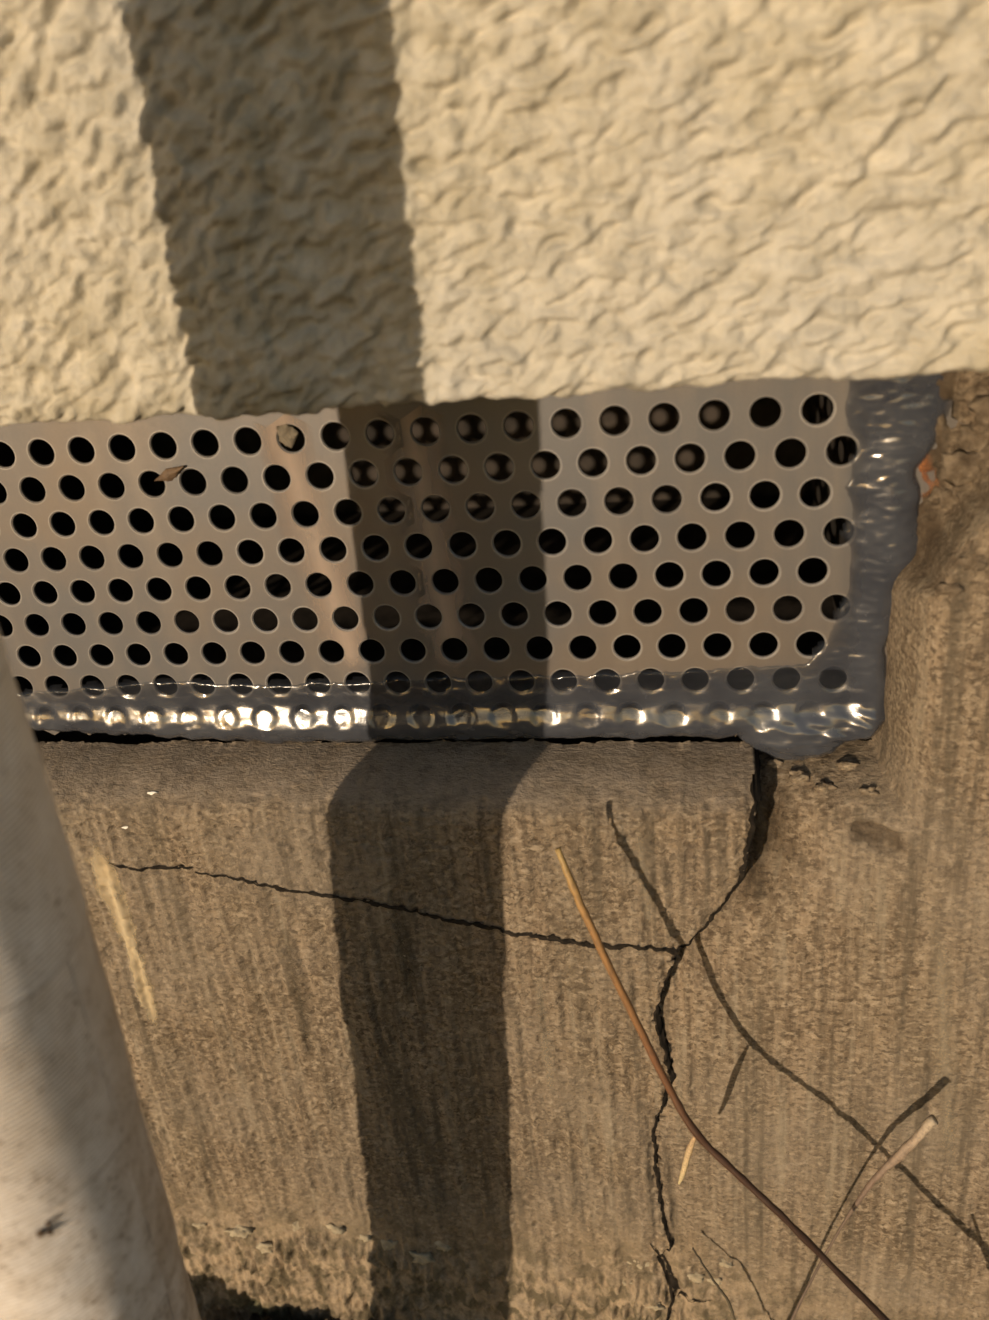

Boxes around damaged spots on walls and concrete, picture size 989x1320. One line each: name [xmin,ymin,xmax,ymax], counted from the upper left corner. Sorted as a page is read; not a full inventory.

crack [108,749,762,1320]